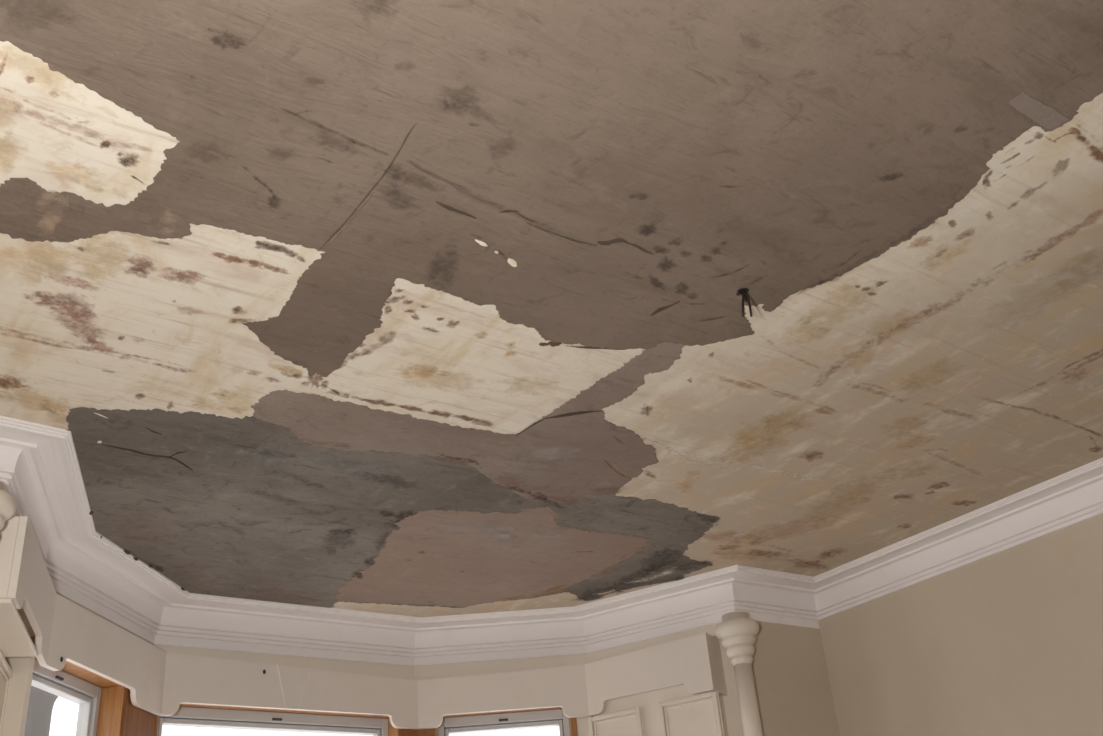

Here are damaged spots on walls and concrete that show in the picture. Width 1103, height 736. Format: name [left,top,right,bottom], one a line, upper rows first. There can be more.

spalling [436,201,476,219]
damp [214,253,279,272]
damp [257,241,303,261]
spalling [475,239,517,267]
spalling [527,223,654,255]
peeling [385,290,443,332]
peeling [539,341,623,350]
peeling [360,399,491,426]
crack [101,427,193,471]